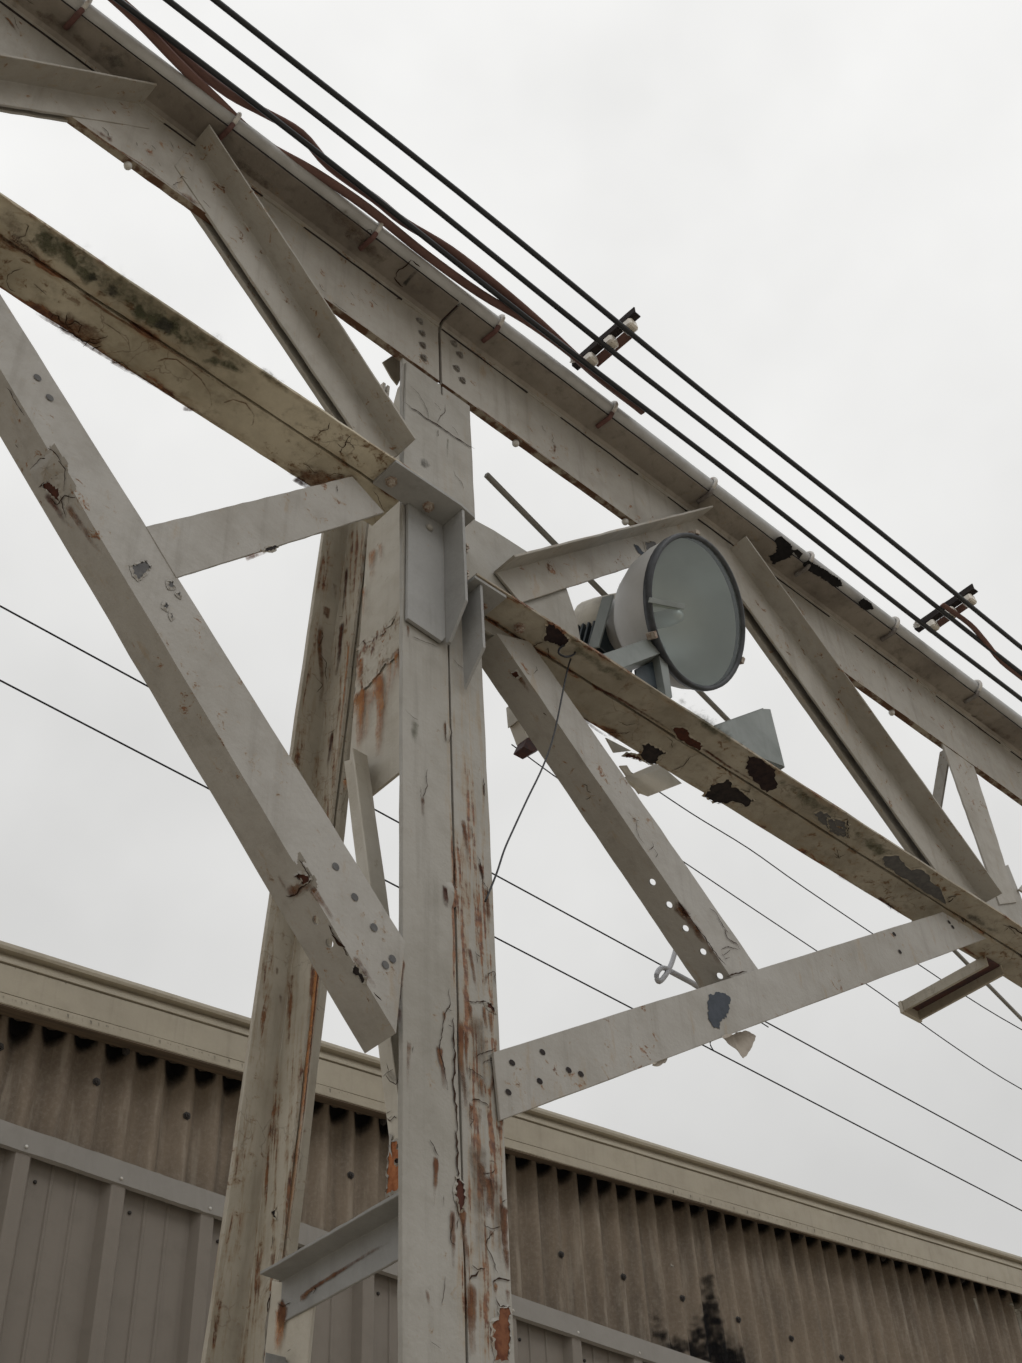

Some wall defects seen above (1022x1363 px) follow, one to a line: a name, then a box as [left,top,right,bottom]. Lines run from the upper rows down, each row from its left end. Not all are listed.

rust [42,476,87,535]
rust [317,569,398,759]
peeling [533,622,571,659]
peeling [605,738,668,765]
peeling [702,756,778,807]
rust [276,852,329,913]
leakage [8,1015,242,1094]
rust [300,970,319,1131]
peeling [707,992,756,1058]
leakage [313,1089,389,1137]
leakage [505,1153,1022,1333]
leakage [654,1278,746,1363]